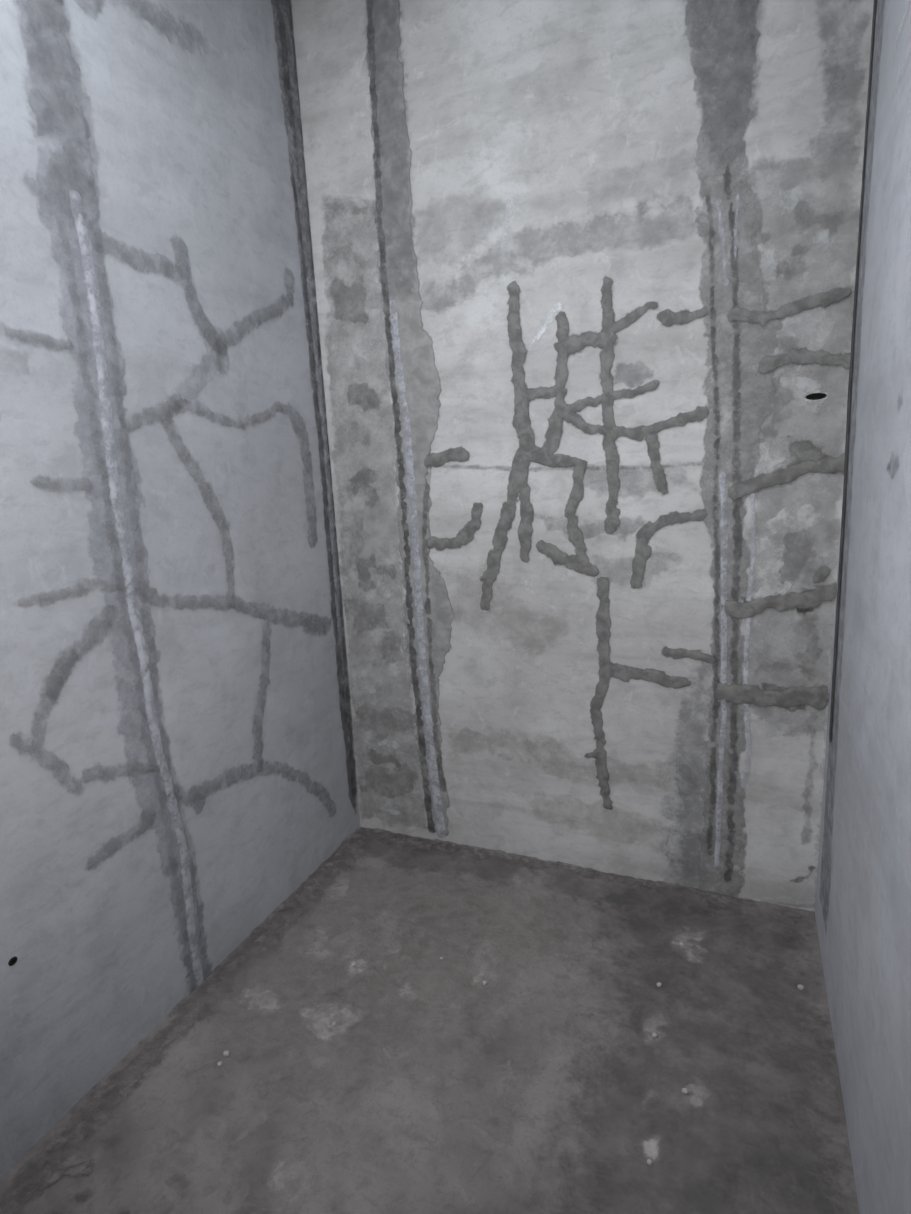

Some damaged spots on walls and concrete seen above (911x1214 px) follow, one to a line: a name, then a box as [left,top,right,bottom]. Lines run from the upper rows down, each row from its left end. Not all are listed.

crack [5,327,72,350]
crack [92,235,293,352]
crack [11,397,335,869]
crack [423,276,851,809]
peeling [748,367,841,742]